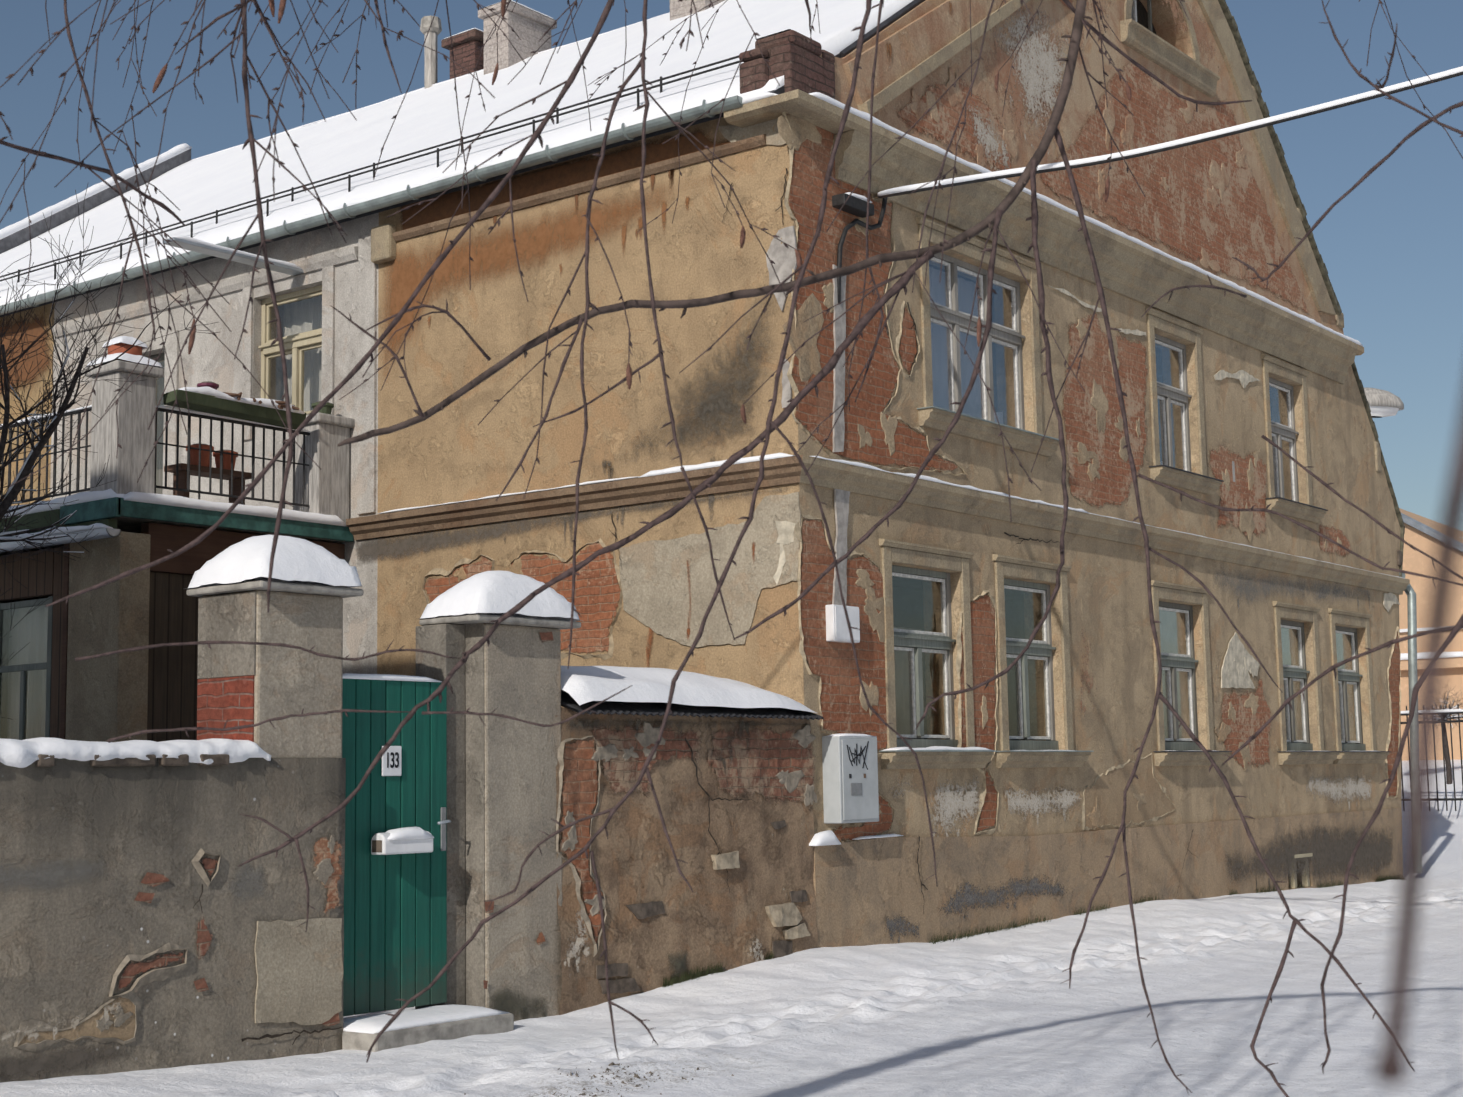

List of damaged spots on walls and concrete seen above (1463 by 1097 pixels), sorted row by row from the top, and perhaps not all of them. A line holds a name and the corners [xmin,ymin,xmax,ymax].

spalling [777,112,966,476]
leakage [676,321,761,445]
spalling [1049,286,1148,512]
spalling [422,538,623,660]
spalling [556,515,895,994]
spalling [956,590,999,835]
spalling [1214,632,1272,771]
spalling [313,835,343,913]
flaking render [13,918,213,1052]